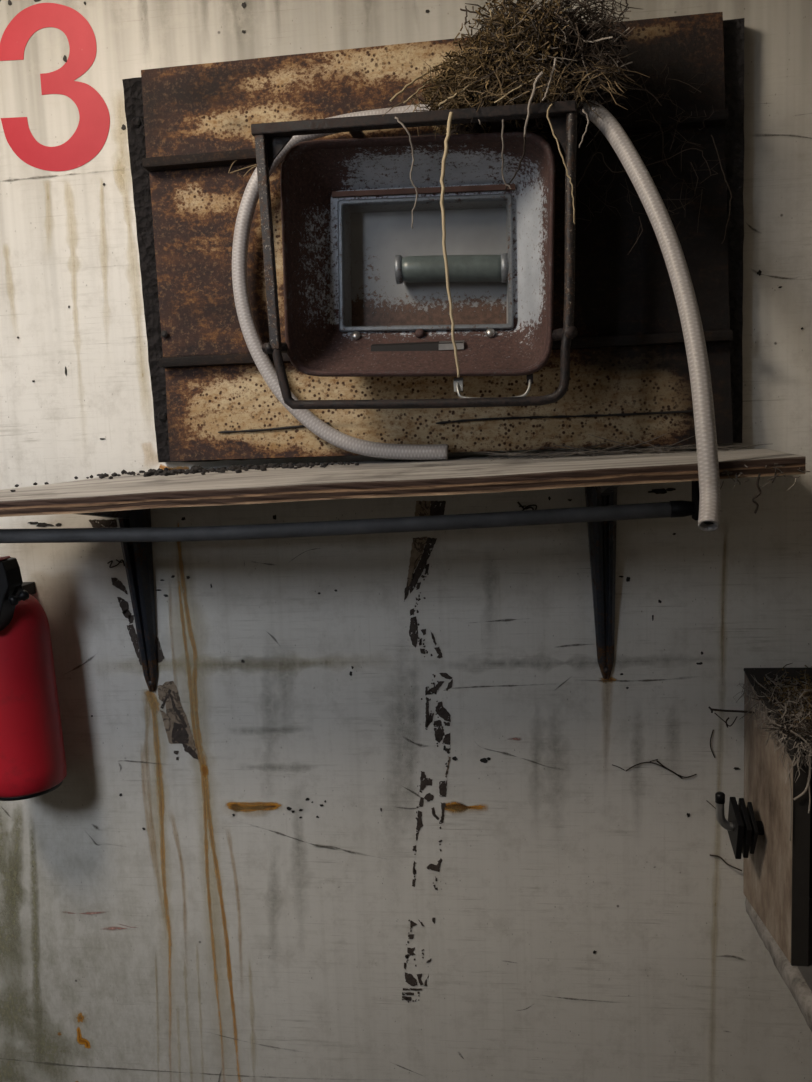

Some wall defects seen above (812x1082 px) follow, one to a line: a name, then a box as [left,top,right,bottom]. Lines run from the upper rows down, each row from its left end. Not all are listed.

peeling [415,500,446,516]
peeling [404,537,442,659]
rust [146,691,171,967]
peeling [157,681,199,760]
rust [177,542,240,1081]
rust [227,802,280,812]
peeling [412,673,458,890]
rust [445,802,483,812]
damp [0,814,66,1068]
peeling [402,918,435,1001]